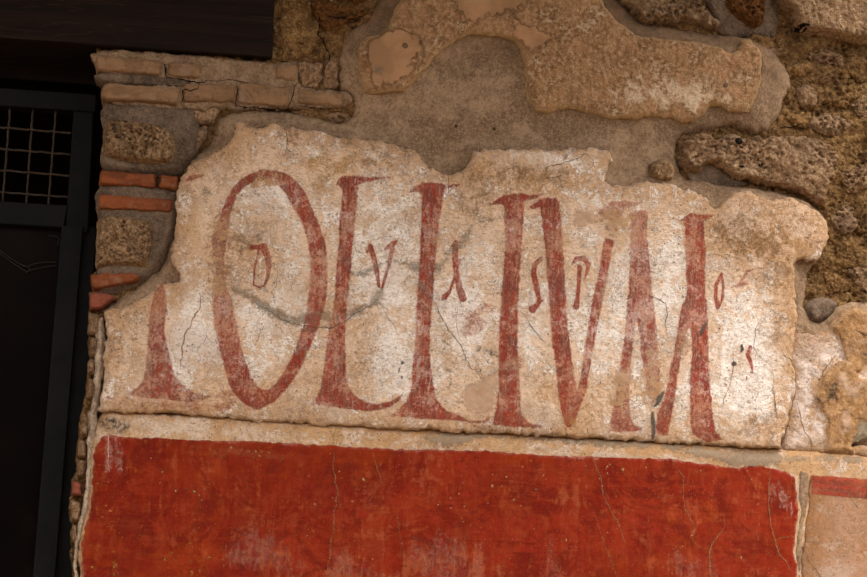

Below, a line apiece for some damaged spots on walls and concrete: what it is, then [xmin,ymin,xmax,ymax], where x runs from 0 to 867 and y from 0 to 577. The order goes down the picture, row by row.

crack [180,293,207,367]
crack [326,450,340,577]
crack [593,458,626,575]
crack [673,463,725,577]